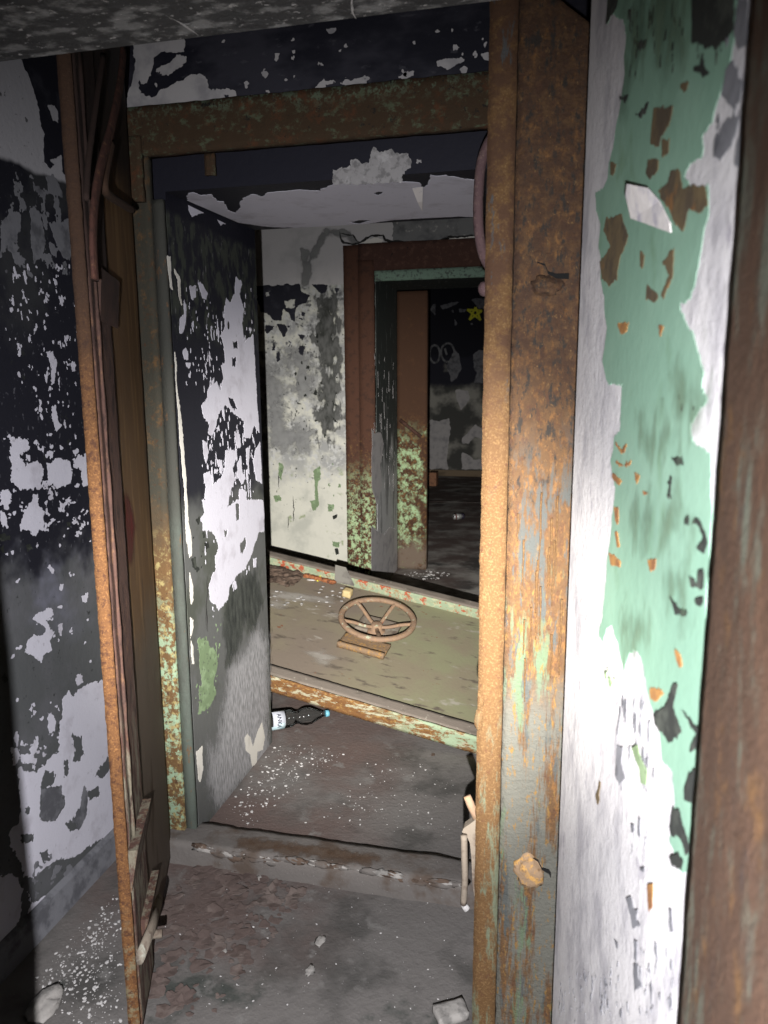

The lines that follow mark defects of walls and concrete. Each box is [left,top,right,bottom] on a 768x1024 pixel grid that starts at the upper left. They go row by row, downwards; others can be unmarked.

peeling [127,39,249,108]
peeling [187,147,474,228]
peeling [0,55,91,547]
peeling [167,255,341,611]
peeling [595,0,748,875]
peeling [11,605,73,663]
peeling [190,618,221,714]
rust [474,693,484,731]
rust [517,492,563,702]
peeling [0,674,114,941]
rust [475,784,484,817]
flaking render [558,896,673,1023]